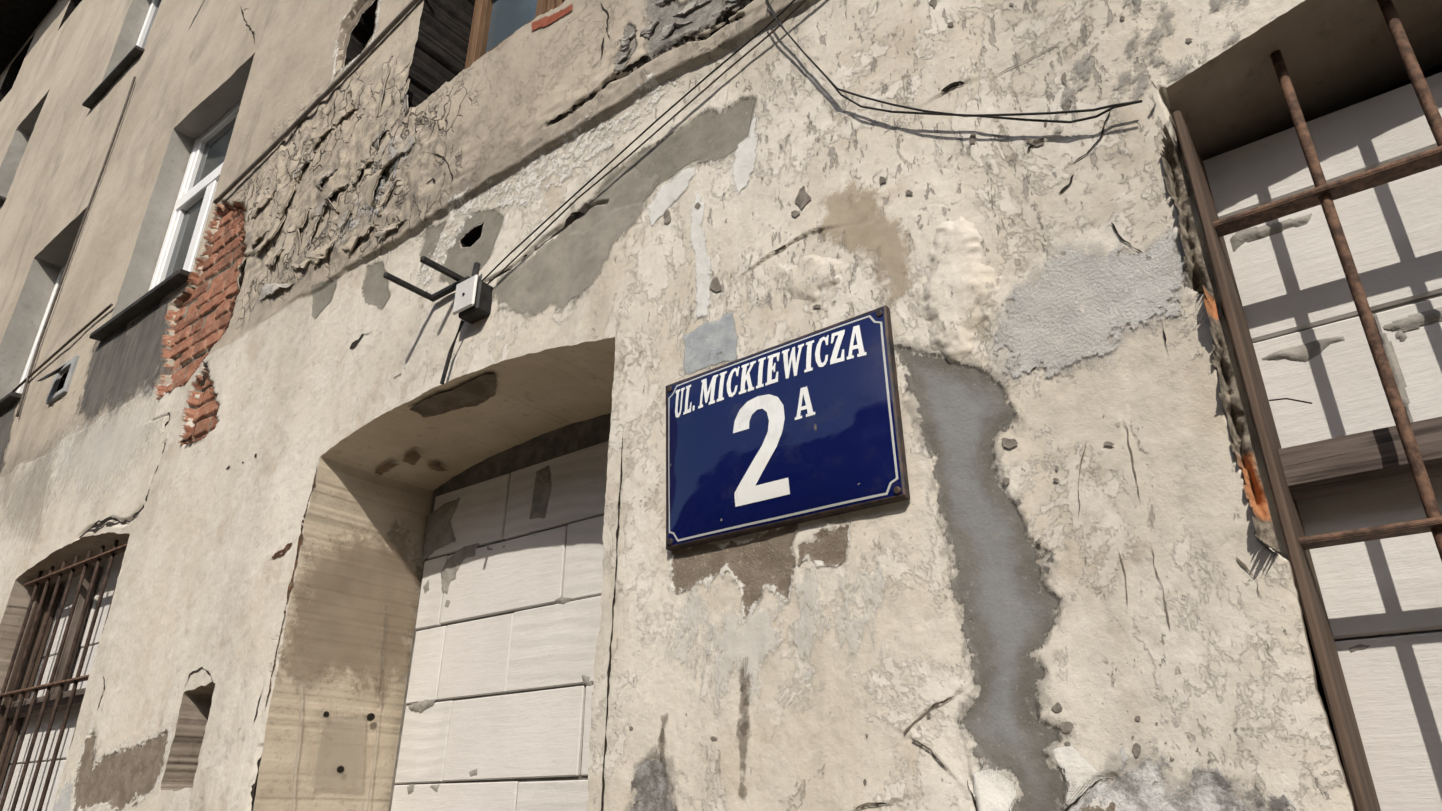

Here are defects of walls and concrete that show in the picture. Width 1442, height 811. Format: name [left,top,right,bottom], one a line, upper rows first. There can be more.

spalling [612,0,751,71]
damp [417,71,681,301]
damp [732,117,758,193]
flaking render [155,56,416,445]
damp [492,163,711,317]
spalling [1160,125,1280,552]
spalling [662,522,851,624]
spalling [70,720,173,811]
crack [854,802,892,811]
crack [903,696,977,811]
crack [1065,778,1114,811]
flaking render [1057,716,1305,811]